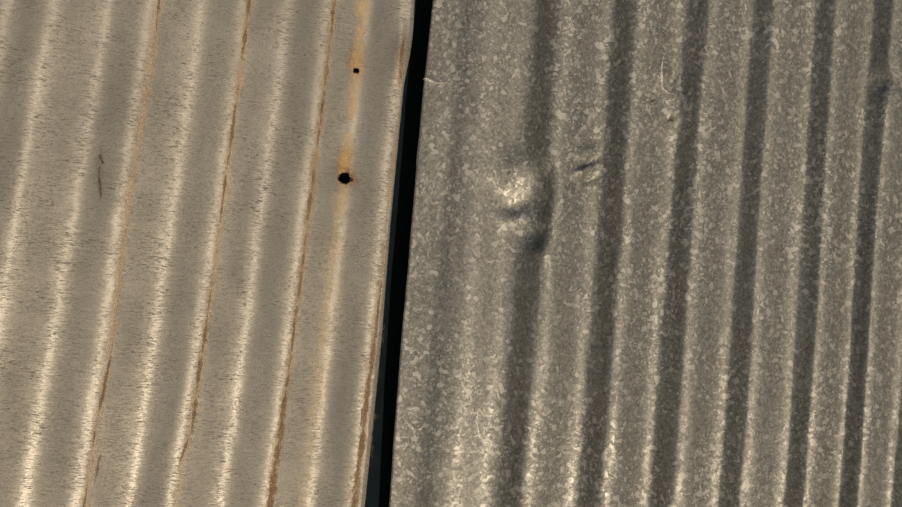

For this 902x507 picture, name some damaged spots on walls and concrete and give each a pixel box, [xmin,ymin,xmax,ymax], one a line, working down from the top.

corrosion [220,0,251,224]
corrosion [97,327,114,412]
corrosion [180,262,216,474]
corrosion [266,91,325,507]